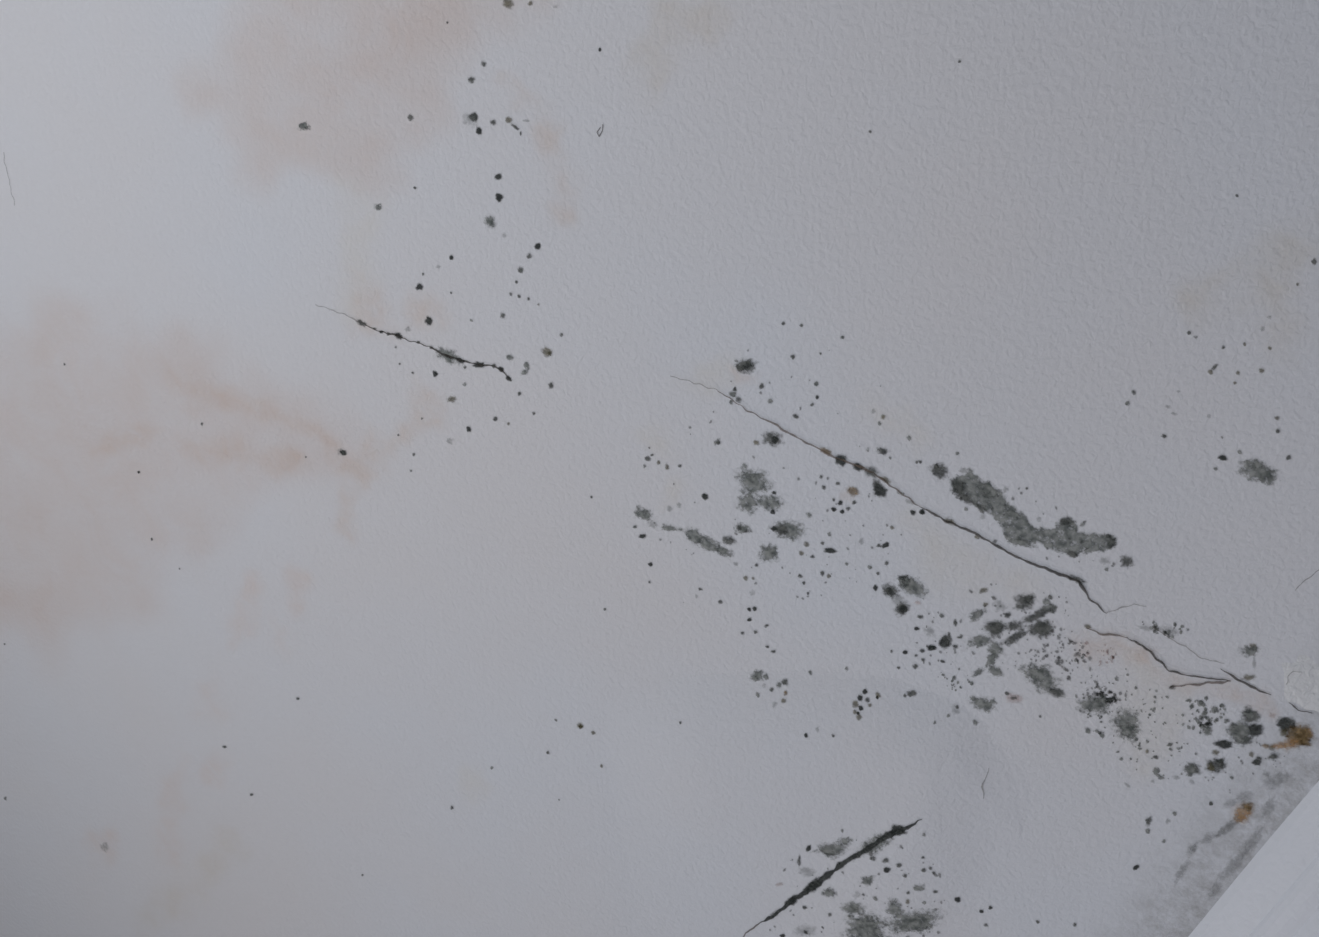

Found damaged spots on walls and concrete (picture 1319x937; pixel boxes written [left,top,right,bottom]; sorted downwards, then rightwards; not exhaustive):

crack [358,320,511,381]
water stain [736,359,755,371]
water stain [633,464,848,580]
water stain [873,480,904,497]
water stain [868,526,928,630]
crack [639,365,1271,719]
water stain [915,461,1132,571]
water stain [891,589,1057,725]
water stain [1018,656,1278,779]
corrosion [1262,717,1312,748]
crack [743,819,922,937]
water stain [822,857,941,937]